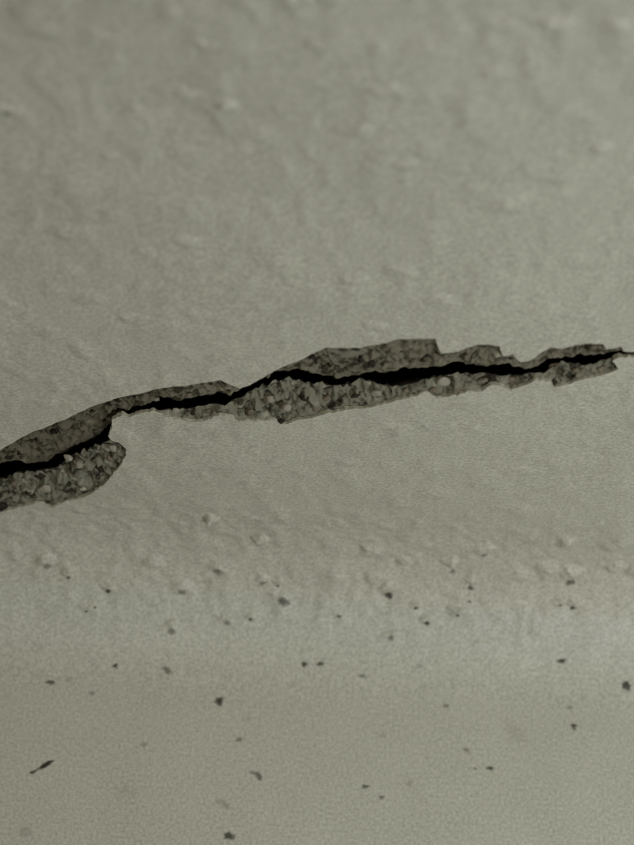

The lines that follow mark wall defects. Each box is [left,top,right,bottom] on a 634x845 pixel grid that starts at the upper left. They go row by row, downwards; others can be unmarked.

crack [0,347,634,481]